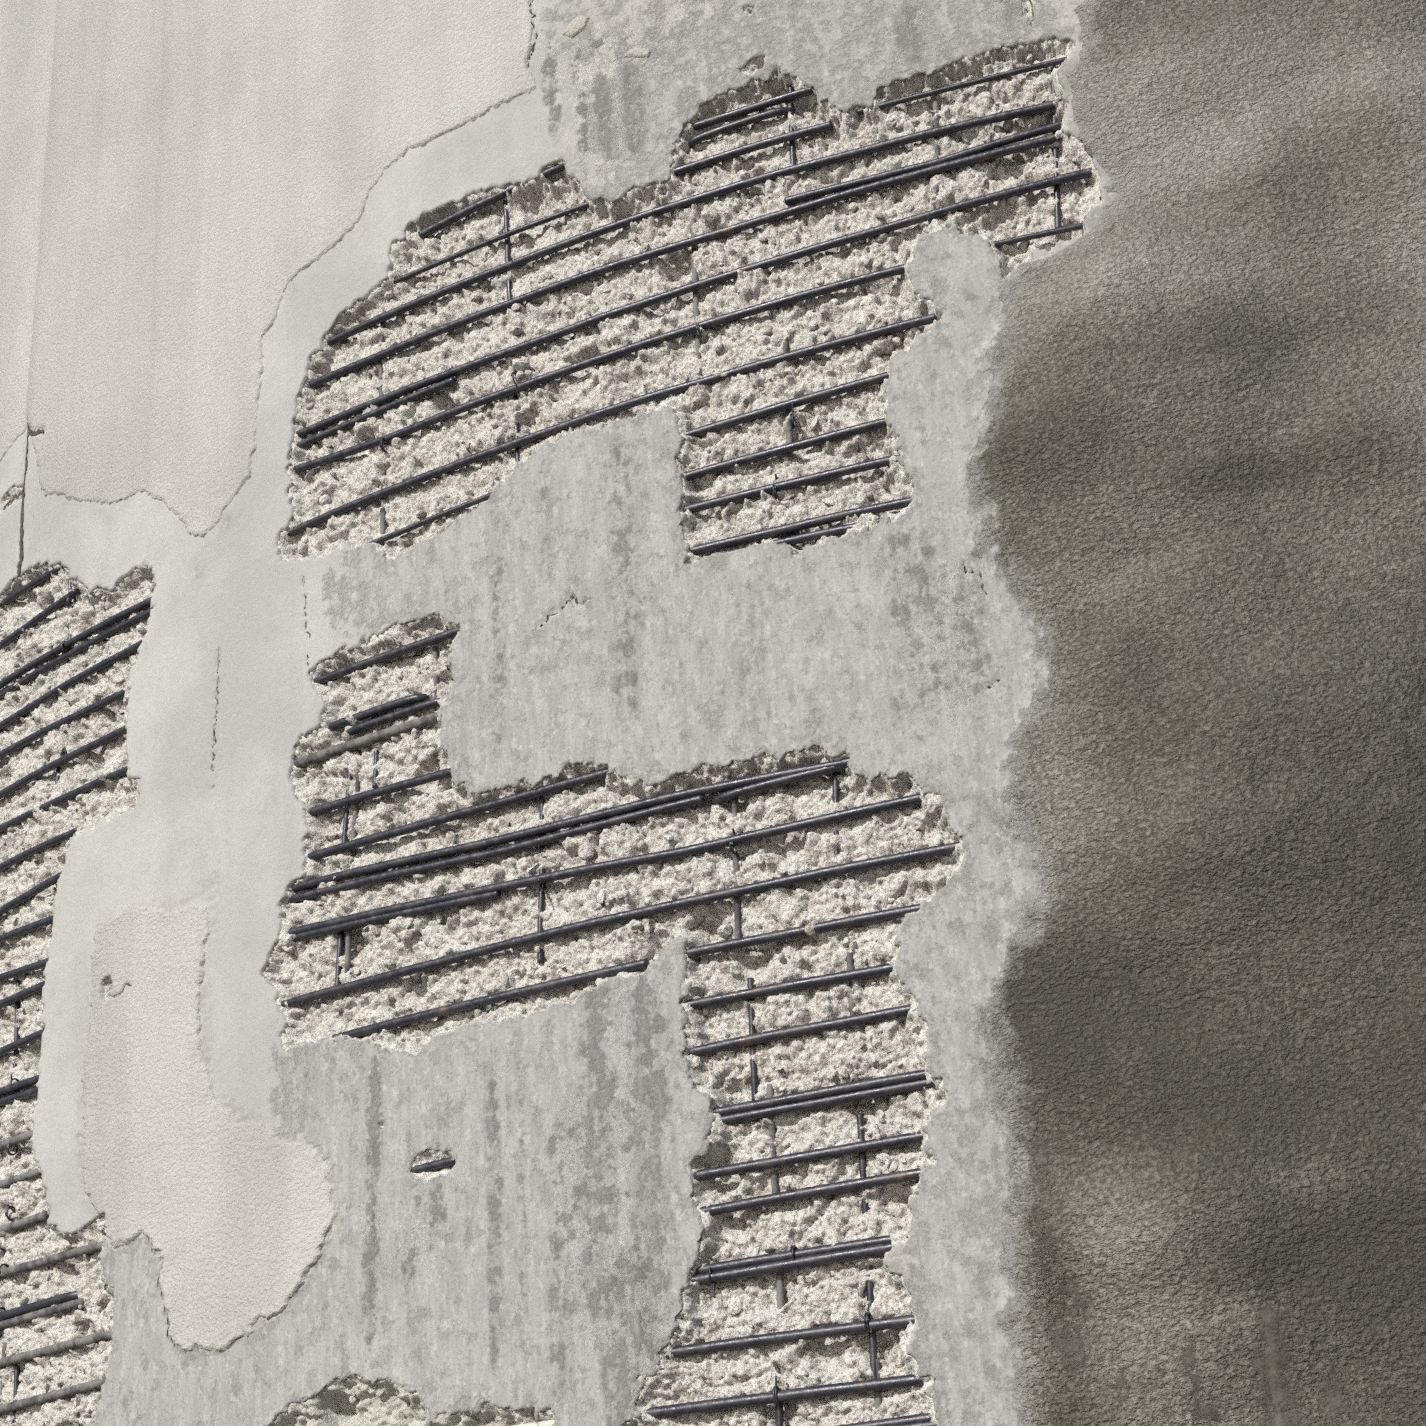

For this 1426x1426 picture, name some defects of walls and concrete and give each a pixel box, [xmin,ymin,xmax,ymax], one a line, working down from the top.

crack [3,423,44,583]
crack [528,0,537,67]
spalling [0,0,1102,1426]
damp [966,0,1426,1426]